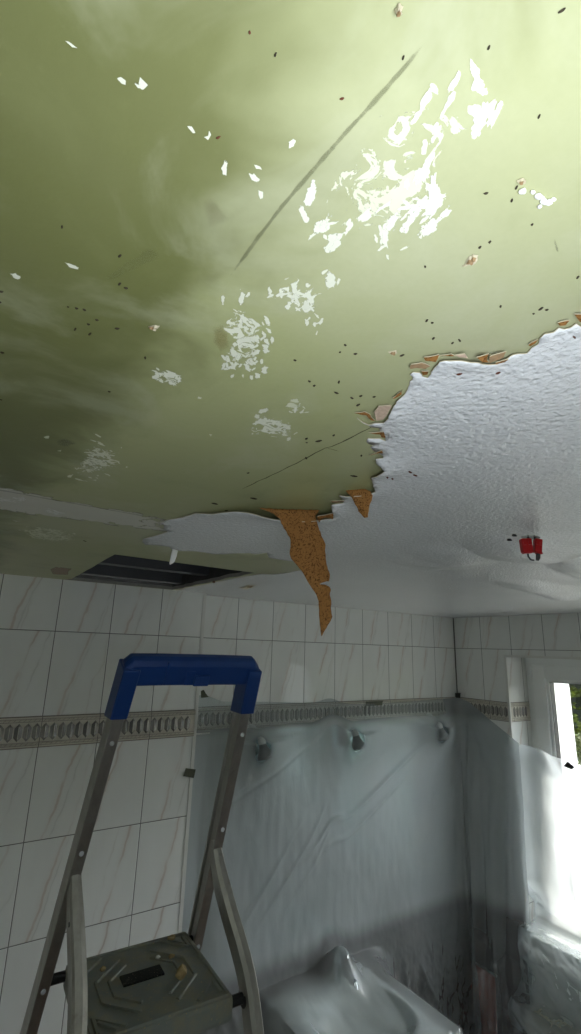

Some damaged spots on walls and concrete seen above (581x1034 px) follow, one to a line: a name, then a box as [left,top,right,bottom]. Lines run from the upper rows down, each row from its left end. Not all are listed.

peeling [299,59,503,260]
peeling [267,287,323,335]
peeling [221,316,274,380]
peeling [389,339,508,375]
peeling [252,406,335,443]